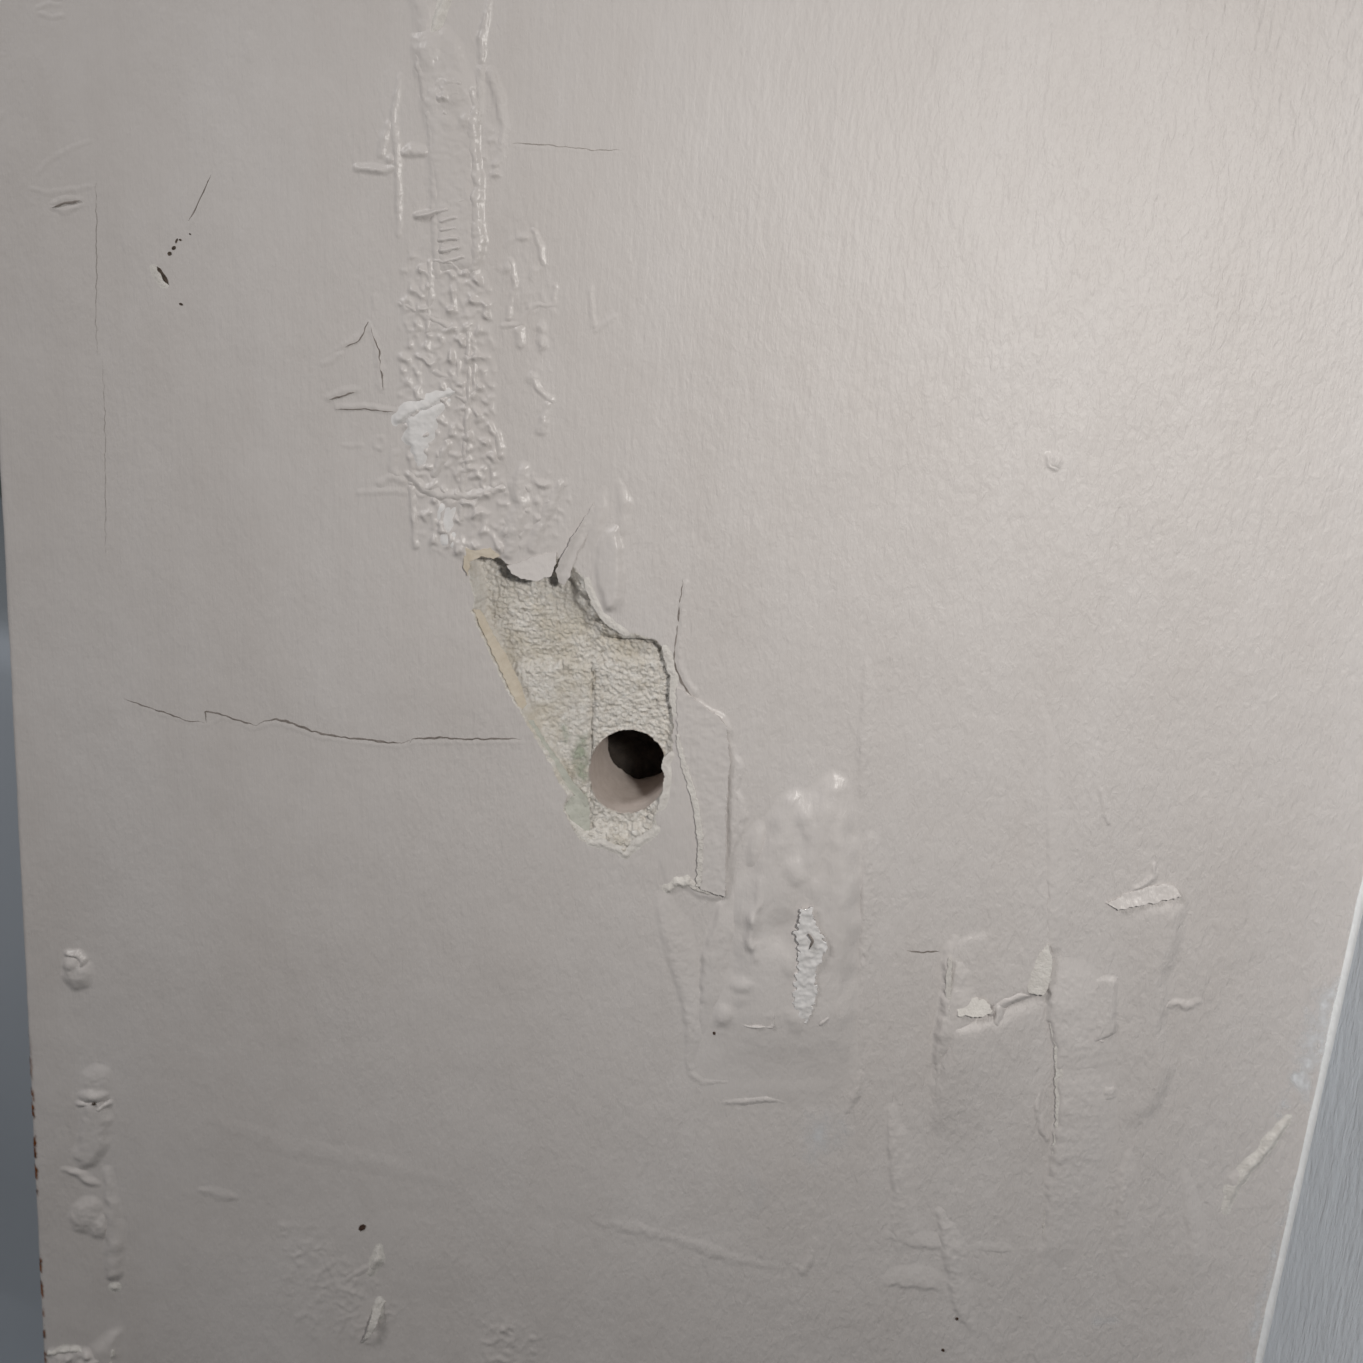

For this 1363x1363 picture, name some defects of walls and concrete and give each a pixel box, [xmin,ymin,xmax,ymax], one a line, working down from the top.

peeling [391,387,455,466]
flaking render [437,503,679,860]
crack [127,700,527,750]